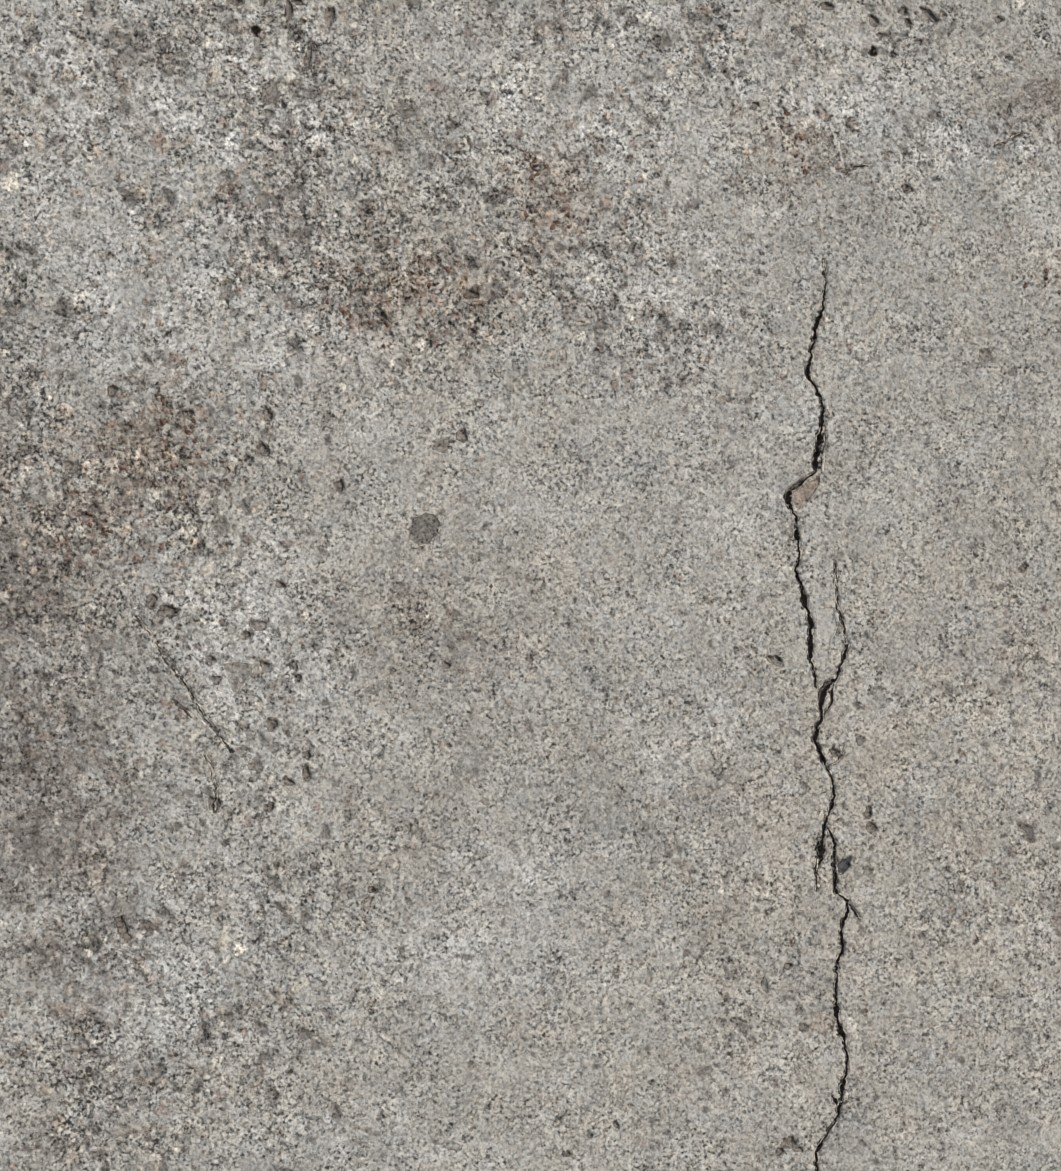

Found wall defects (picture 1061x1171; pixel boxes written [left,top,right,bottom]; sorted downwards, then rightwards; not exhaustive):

crack [777,259,862,1171]